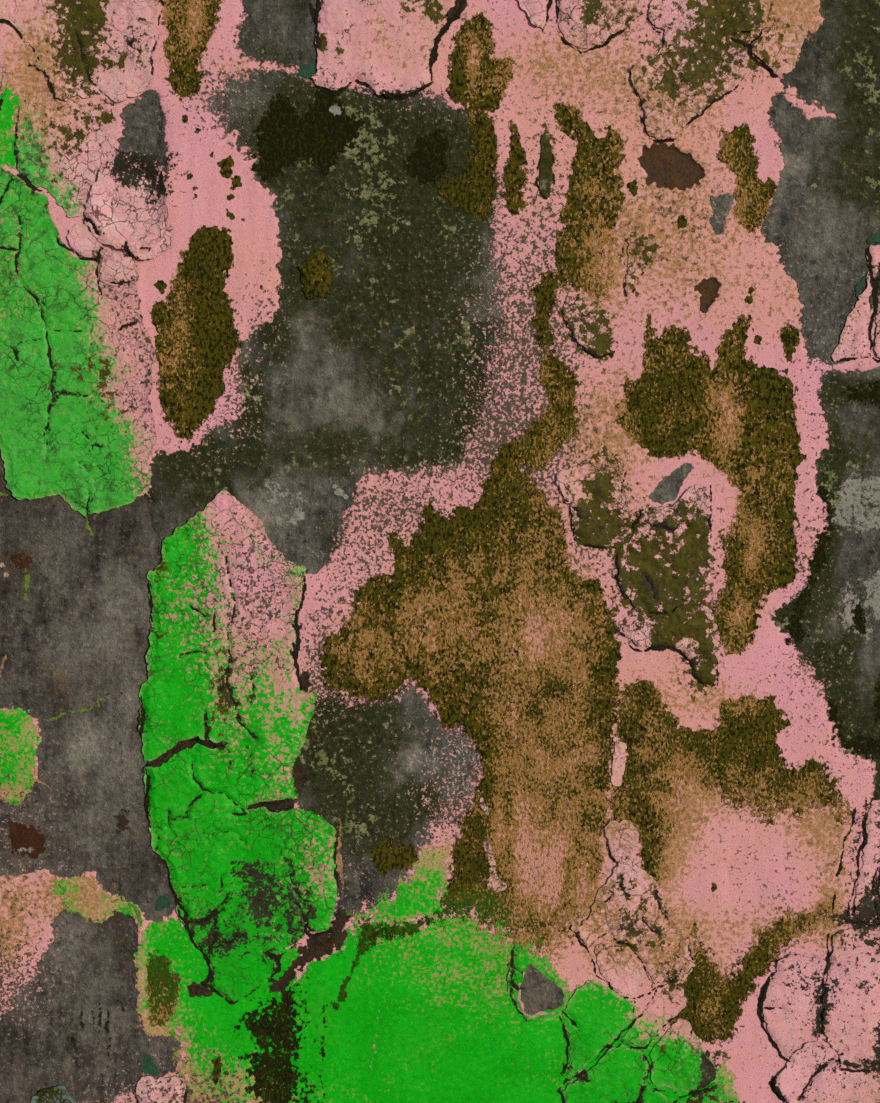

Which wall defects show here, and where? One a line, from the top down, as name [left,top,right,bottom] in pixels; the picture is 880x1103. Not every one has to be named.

crack [542,0,661,54]
crack [633,25,778,143]
crack [0,94,88,445]
crack [57,217,136,295]
crack [838,248,880,363]
peeling [0,0,511,1103]
peeling [507,0,880,1103]
crack [139,557,336,1005]
crack [332,839,340,888]
crack [557,843,734,1103]
crack [757,970,880,1103]
crack [822,800,880,989]